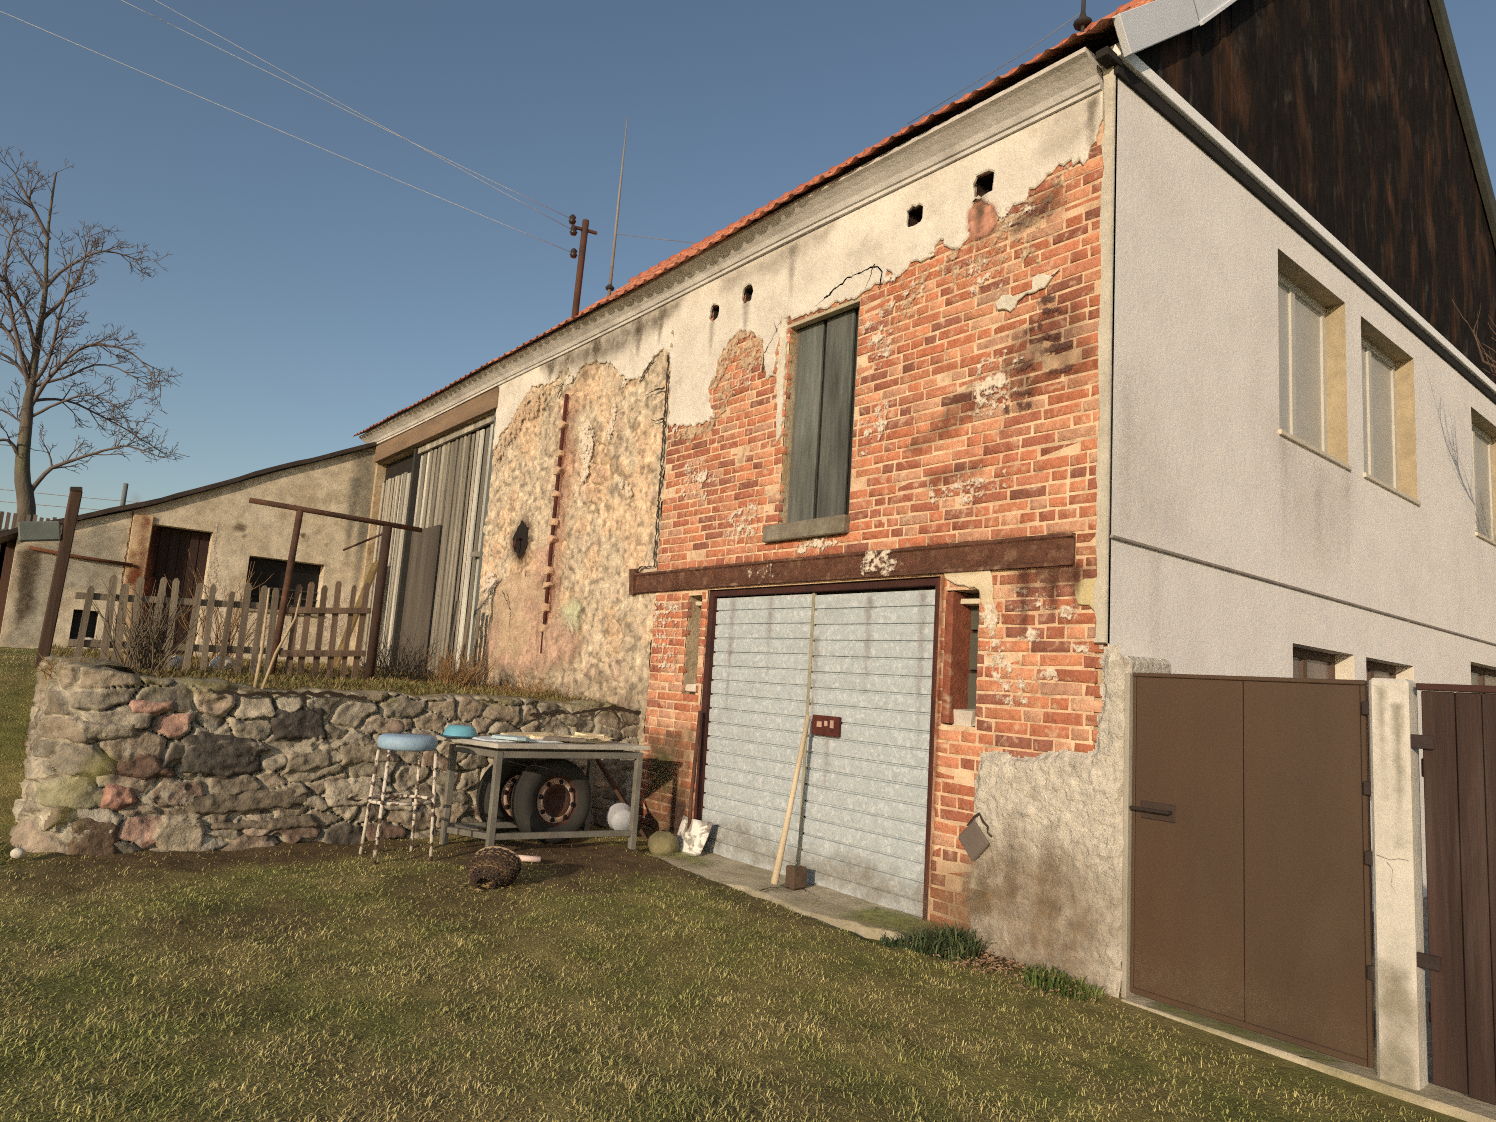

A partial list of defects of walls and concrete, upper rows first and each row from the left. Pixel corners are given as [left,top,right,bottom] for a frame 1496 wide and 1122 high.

flaking render [492,90,1104,465]
spalling [511,518,550,583]
corrosion [860,550,906,576]
peeling [480,570,497,594]
peeling [981,603,998,636]
peeling [1017,627,1040,642]
peeling [1060,604,1077,620]
flaking render [965,644,1128,998]